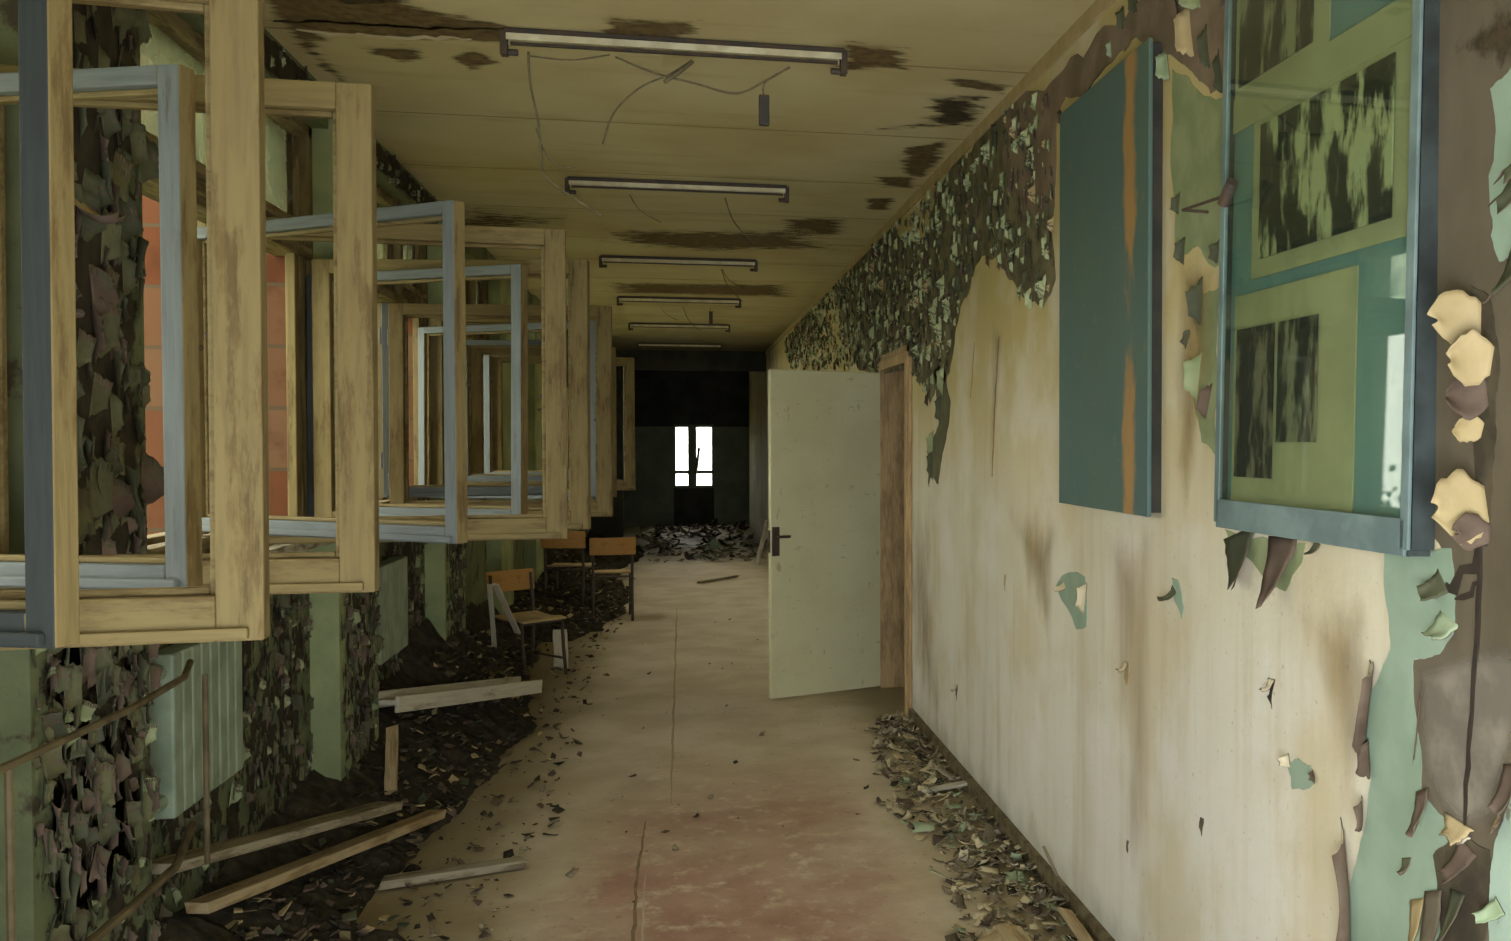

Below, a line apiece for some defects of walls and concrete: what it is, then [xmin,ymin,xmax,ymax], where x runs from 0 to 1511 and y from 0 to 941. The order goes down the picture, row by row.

peeling [72,3,153,69]
damp [269,0,505,79]
damp [602,19,696,38]
damp [847,45,907,70]
damp [867,79,1011,210]
damp [612,219,840,251]
damp [615,282,786,297]
peeling [73,107,164,555]
peeling [1332,0,1511,941]
peeling [1053,572,1087,629]
peeling [1223,529,1320,609]
peeling [30,594,314,941]